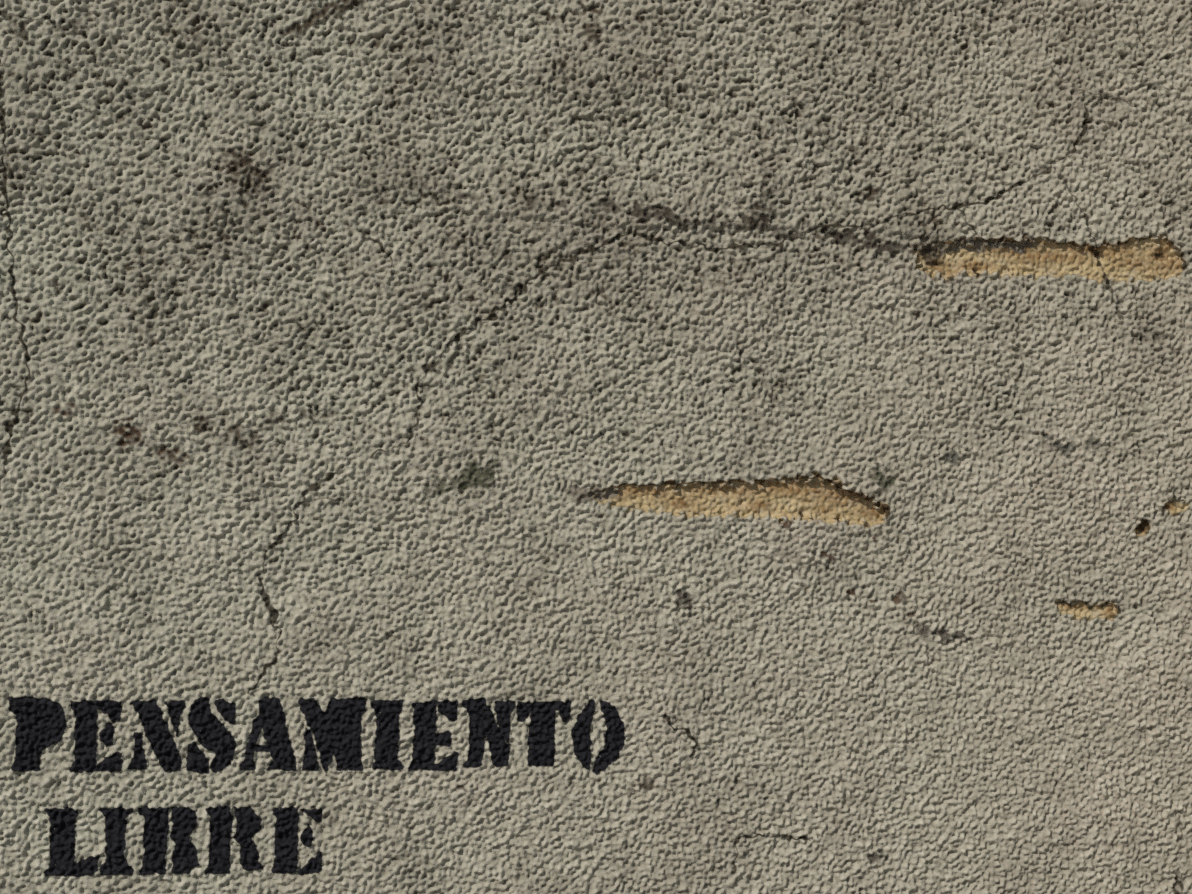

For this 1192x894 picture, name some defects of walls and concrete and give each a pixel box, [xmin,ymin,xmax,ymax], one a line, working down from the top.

crack [0,11,56,24]
crack [0,60,30,487]
flaking render [913,233,1186,284]
crack [248,69,1135,693]
flaking render [565,472,890,528]
flaking render [1055,600,1120,621]